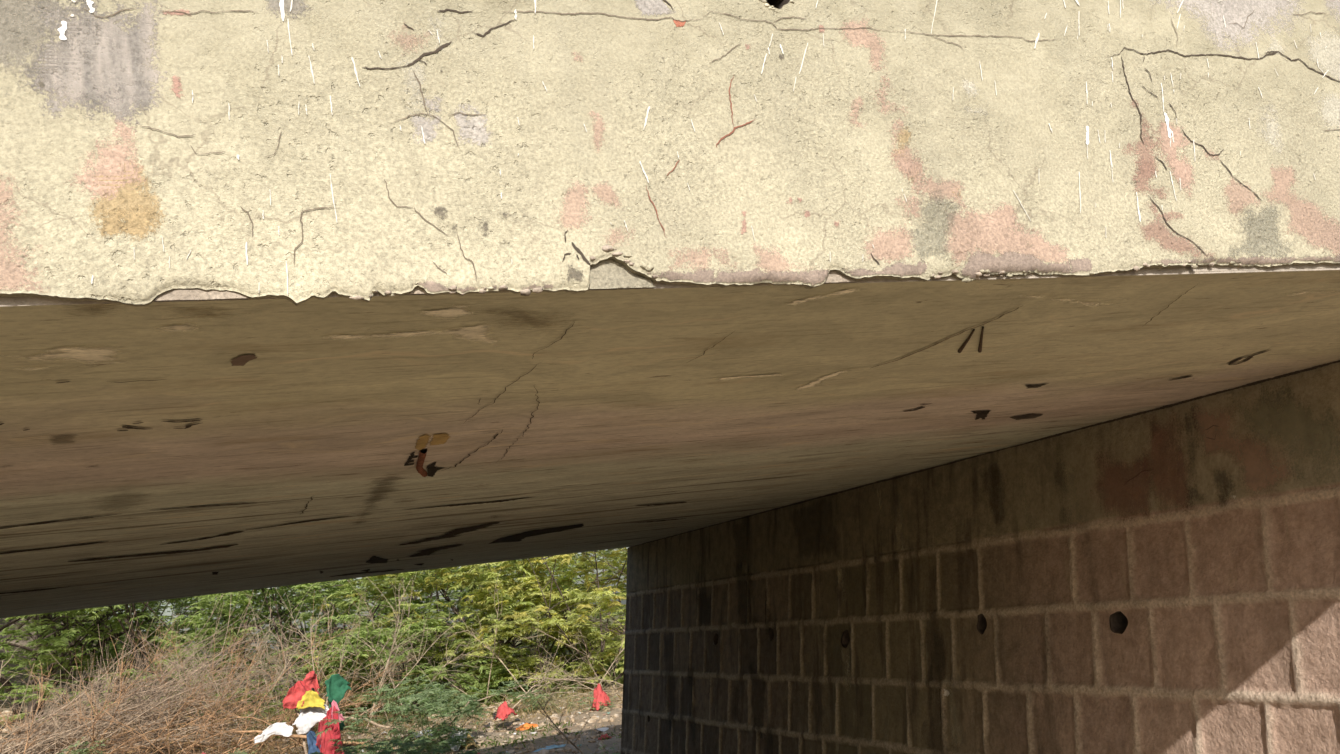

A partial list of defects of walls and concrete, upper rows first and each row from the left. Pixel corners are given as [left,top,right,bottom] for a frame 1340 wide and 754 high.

crack [362,0,1061,150]
crack [384,179,477,282]
peeling [410,281,553,296]
crack [563,230,590,265]
crack [646,160,680,238]
peeling [567,245,1094,289]
crack [1109,12,1340,326]
crack [874,306,1022,367]
crack [437,325,573,472]
crack [330,497,532,577]